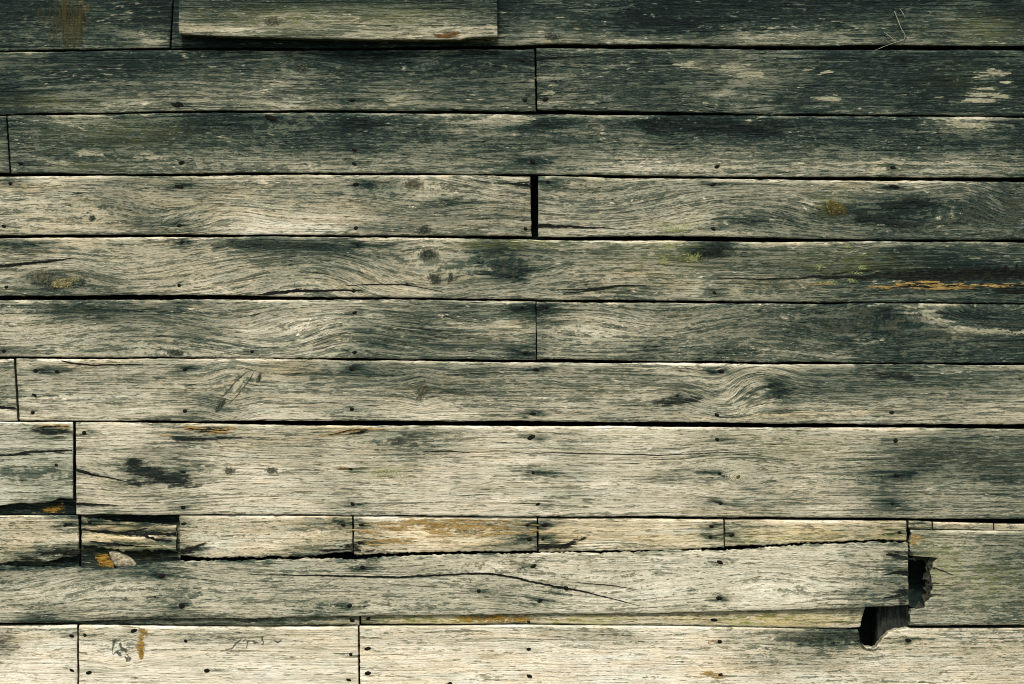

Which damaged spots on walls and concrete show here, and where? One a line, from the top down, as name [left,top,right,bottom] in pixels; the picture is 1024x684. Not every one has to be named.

rust [870,281,1024,290]
damp [124,457,202,489]
rust [95,553,114,568]
crack [251,572,640,606]
rust [137,628,149,659]